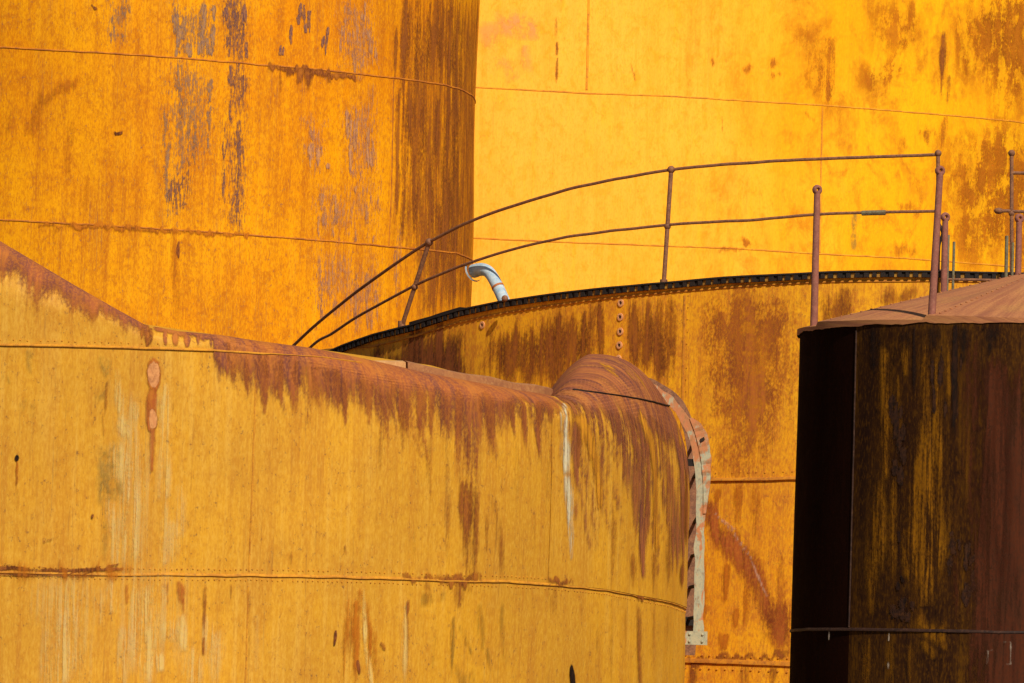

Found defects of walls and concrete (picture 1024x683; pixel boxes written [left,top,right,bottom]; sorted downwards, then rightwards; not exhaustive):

corrosion [940,0,1024,101]
corrosion [955,125,1024,266]
corrosion [0,0,690,604]
corrosion [824,290,851,319]
water stain [561,404,573,550]
corrosion [951,325,1024,683]
corrosion [334,601,385,674]
corrosion [689,487,788,683]